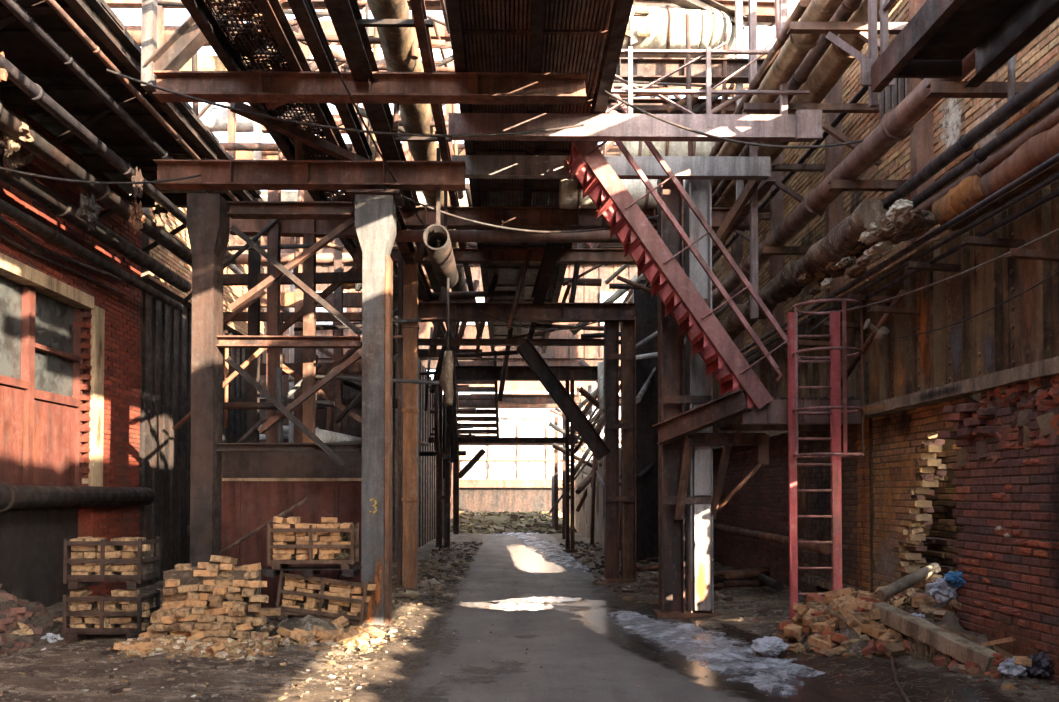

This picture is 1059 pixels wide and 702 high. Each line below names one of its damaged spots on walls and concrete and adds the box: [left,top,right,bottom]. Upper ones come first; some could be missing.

spalling [893,439,947,567]
spalling [1011,521,1059,558]
corrosion [696,563,705,601]
spalling [959,551,1028,628]